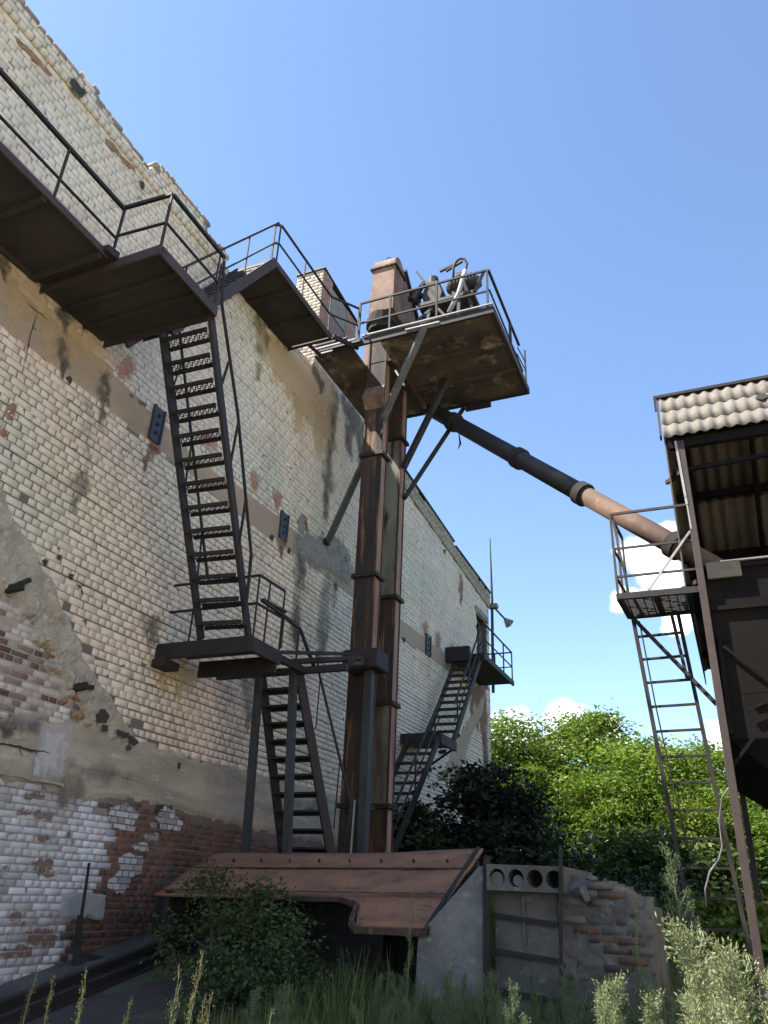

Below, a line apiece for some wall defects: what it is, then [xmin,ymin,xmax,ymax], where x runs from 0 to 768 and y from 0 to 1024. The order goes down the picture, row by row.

damp [0,253,104,378]
damp [100,375,110,422]
damp [258,334,364,518]
damp [297,559,306,587]
damp [292,603,300,647]
crack [0,743,50,756]
peeling [102,725,132,751]
peeling [18,791,54,821]
peeling [33,856,56,878]
peeling [0,912,57,958]